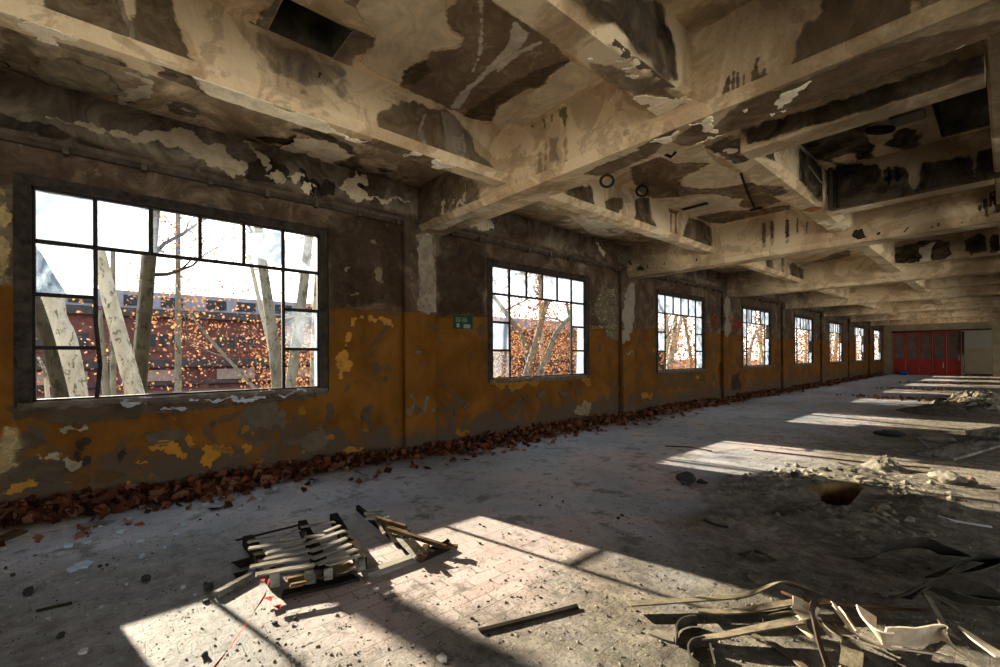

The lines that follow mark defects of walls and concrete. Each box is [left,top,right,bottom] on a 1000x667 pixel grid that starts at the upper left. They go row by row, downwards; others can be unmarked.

peeling [45,116,317,197]
peeling [193,76,371,165]
damp [333,24,375,65]
peeling [339,170,411,205]
damp [360,0,569,172]
peeling [612,39,692,116]
damp [562,21,1000,255]
damp [792,0,940,64]
peeling [0,190,13,284]
peeling [416,232,436,315]
peeling [592,282,635,355]
spalling [0,392,335,473]